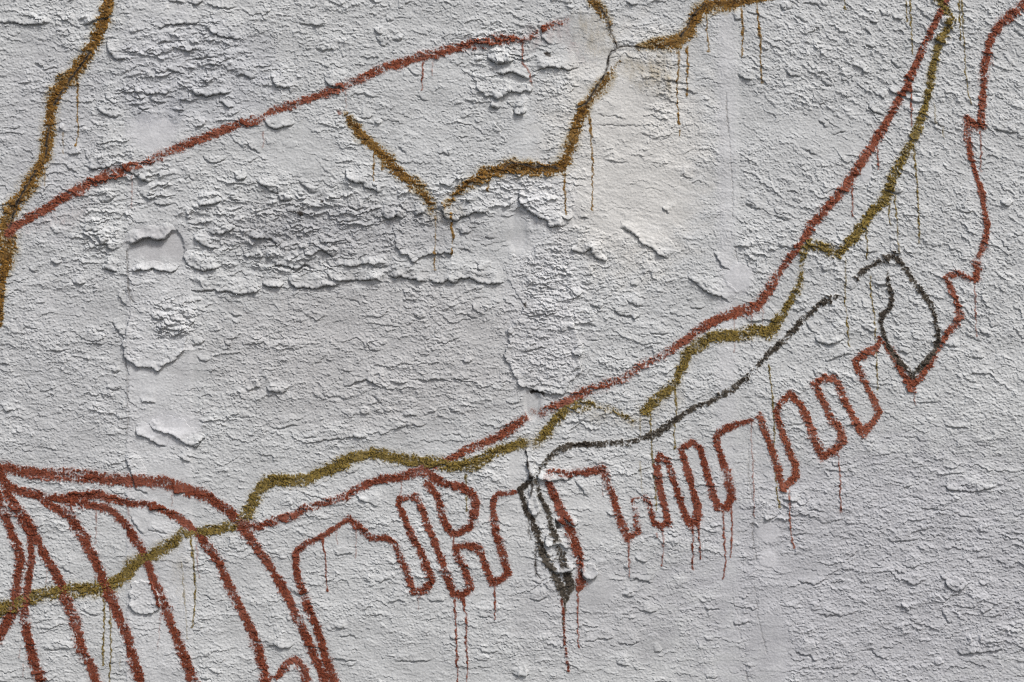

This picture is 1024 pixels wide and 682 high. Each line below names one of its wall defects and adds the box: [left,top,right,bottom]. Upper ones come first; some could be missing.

crack [585,7,640,104]
flaking render [124,222,174,244]
flaking render [135,413,206,448]
crack [525,449,539,577]